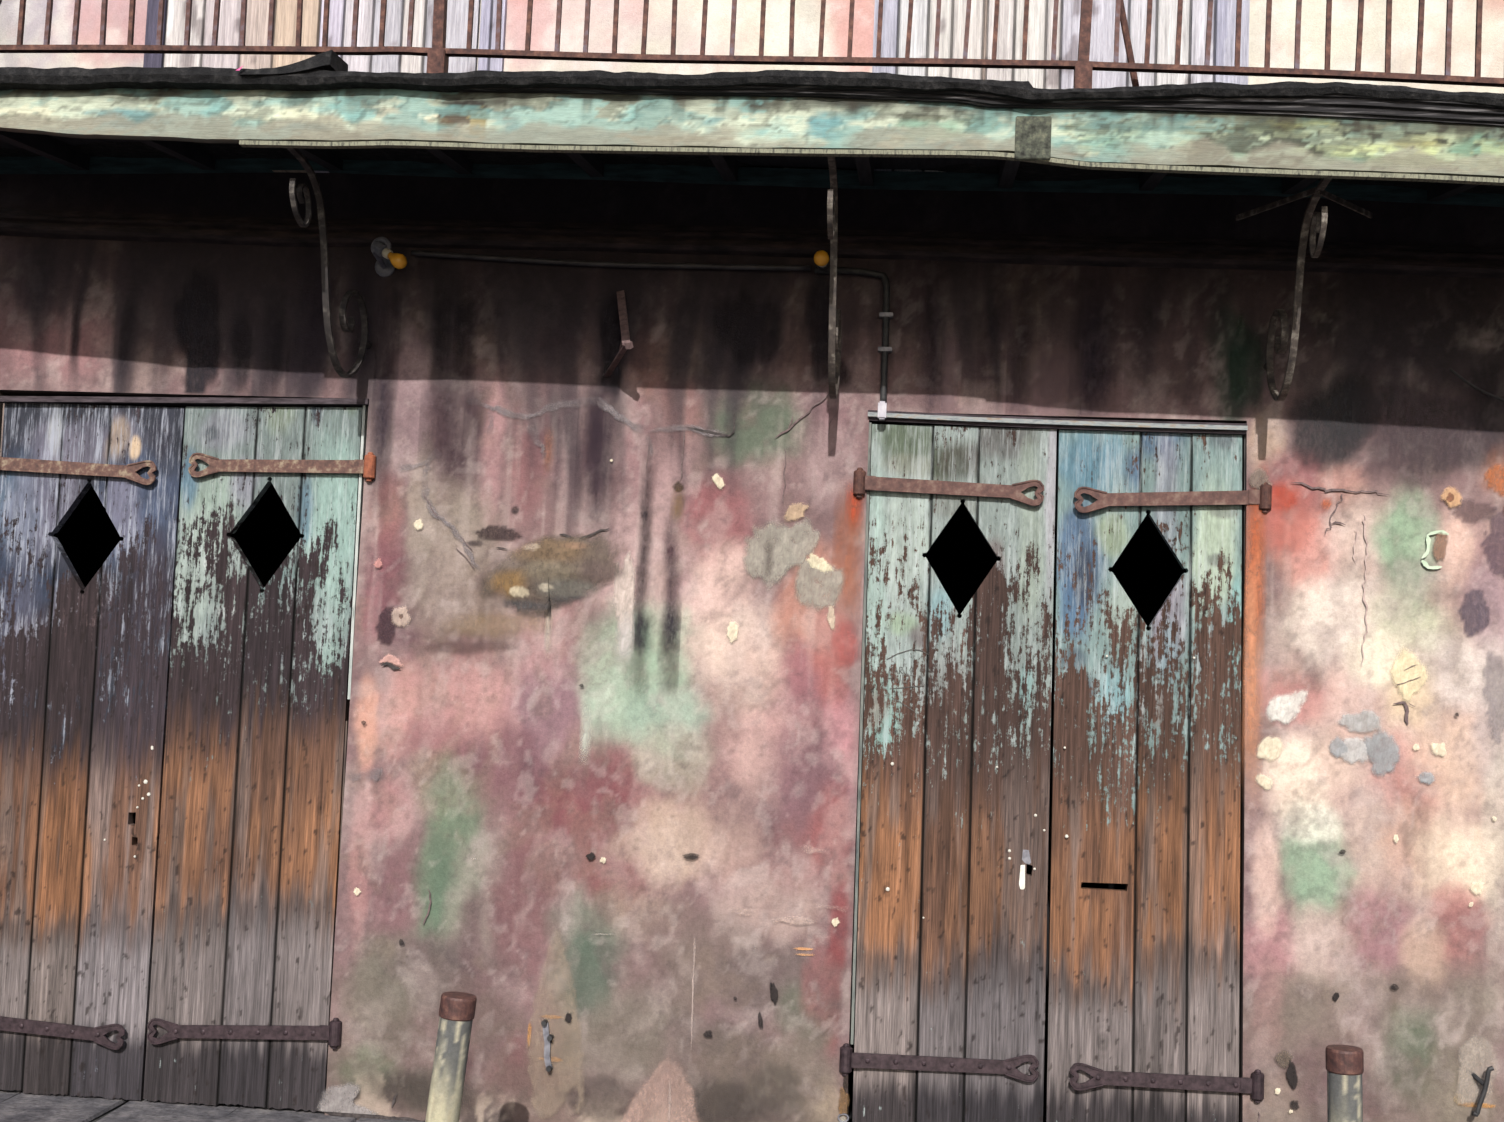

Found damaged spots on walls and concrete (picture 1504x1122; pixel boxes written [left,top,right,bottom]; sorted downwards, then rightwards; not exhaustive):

damp [175,271,250,393]
damp [602,299,623,387]
damp [808,277,848,384]
damp [1370,378,1504,481]
peeling [745,503,842,629]
crack [1293,482,1389,668]
spalling [1391,649,1427,701]
peeling [1256,691,1307,789]
peeling [1330,710,1446,774]